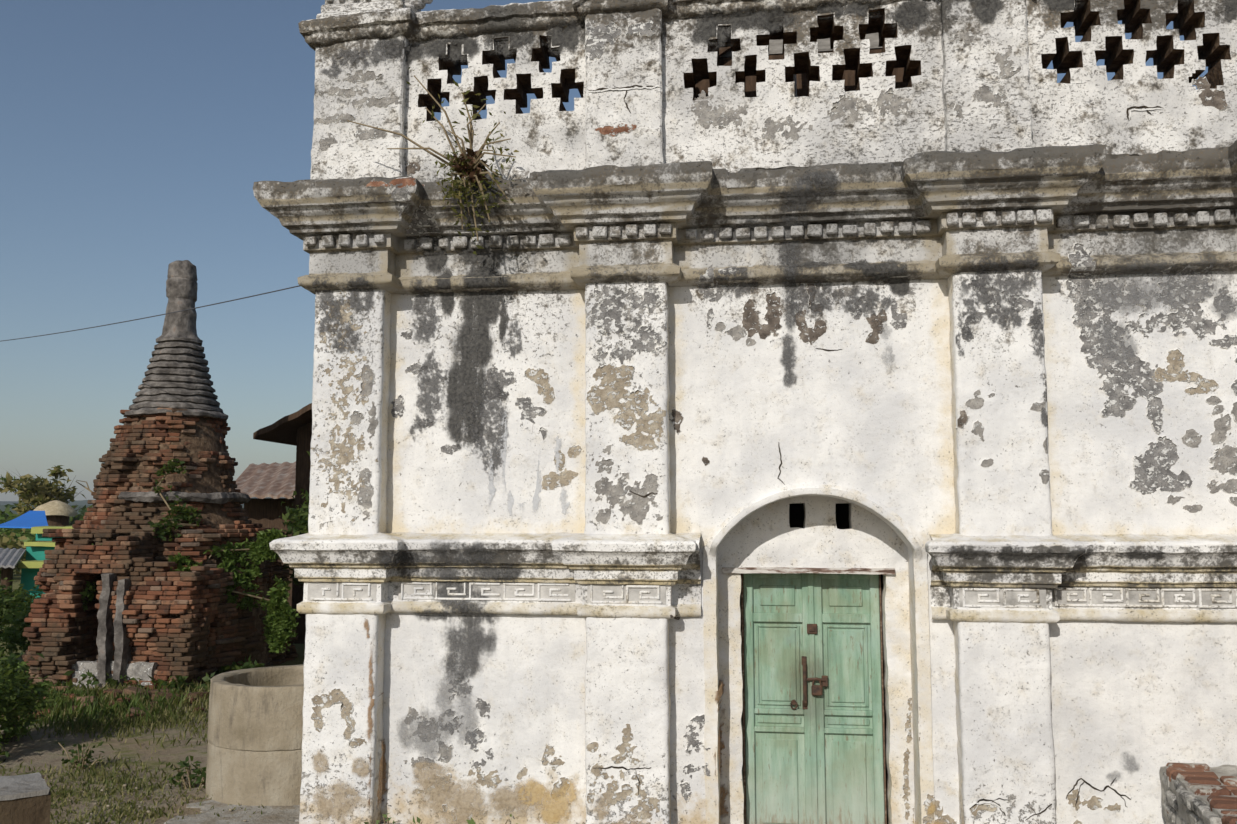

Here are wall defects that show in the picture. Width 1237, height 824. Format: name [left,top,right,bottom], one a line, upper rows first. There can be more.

water stain [410,172,542,515]
peeling [484,363,555,441]
peeling [542,268,684,525]
water stain [727,171,910,386]
peeling [1064,243,1237,513]
water stain [949,544,1093,562]
water stain [1121,549,1165,559]
peeling [311,687,368,748]
peeling [403,677,502,821]
water stain [380,543,576,824]
peeling [586,723,663,824]
crack [970,778,1131,821]